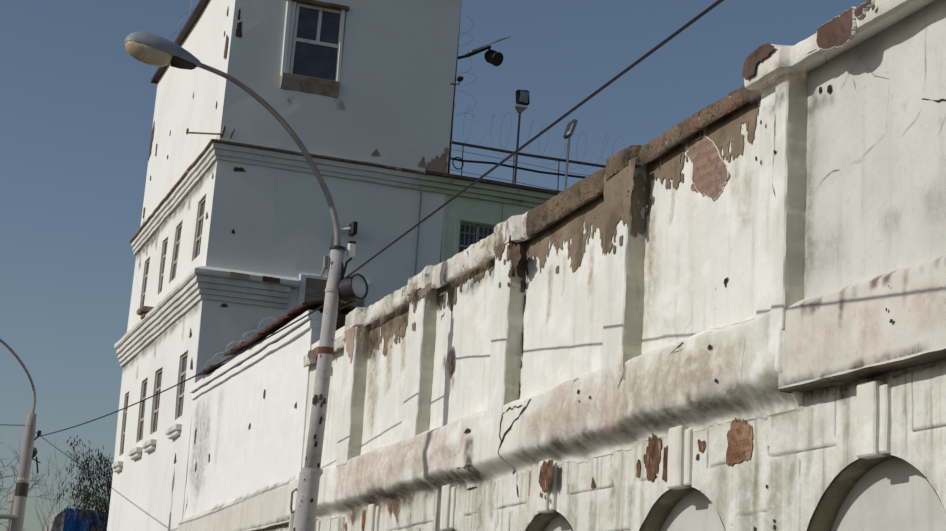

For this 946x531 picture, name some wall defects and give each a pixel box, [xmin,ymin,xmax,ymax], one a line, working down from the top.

spalling [816,0,875,51]
spalling [742,43,774,79]
crack [808,45,946,189]
peeling [367,98,762,361]
crack [498,282,531,496]
peeling [539,460,553,500]
peeling [636,433,668,482]
spalling [726,417,753,466]